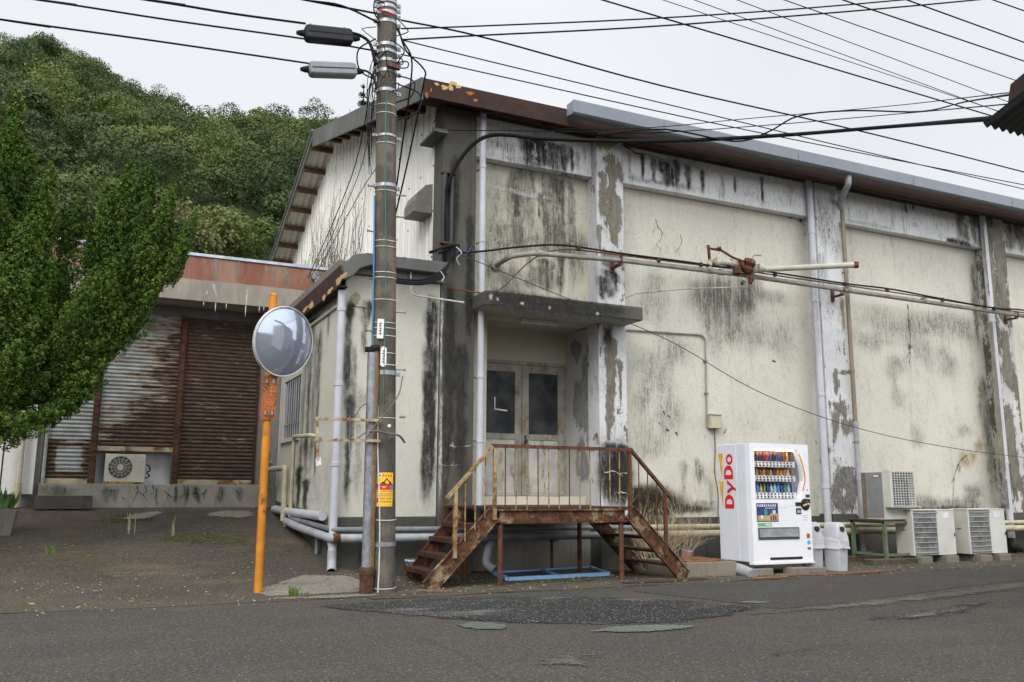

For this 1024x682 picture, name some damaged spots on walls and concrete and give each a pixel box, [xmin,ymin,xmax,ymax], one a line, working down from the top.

damp [300,301,372,494]
damp [421,159,474,490]
damp [489,138,622,322]
peeling [570,313,624,482]
peeling [595,136,626,272]
damp [628,155,705,191]
damp [695,281,756,328]
peeling [828,368,853,442]
peeling [830,456,858,515]
peeling [982,220,1019,508]